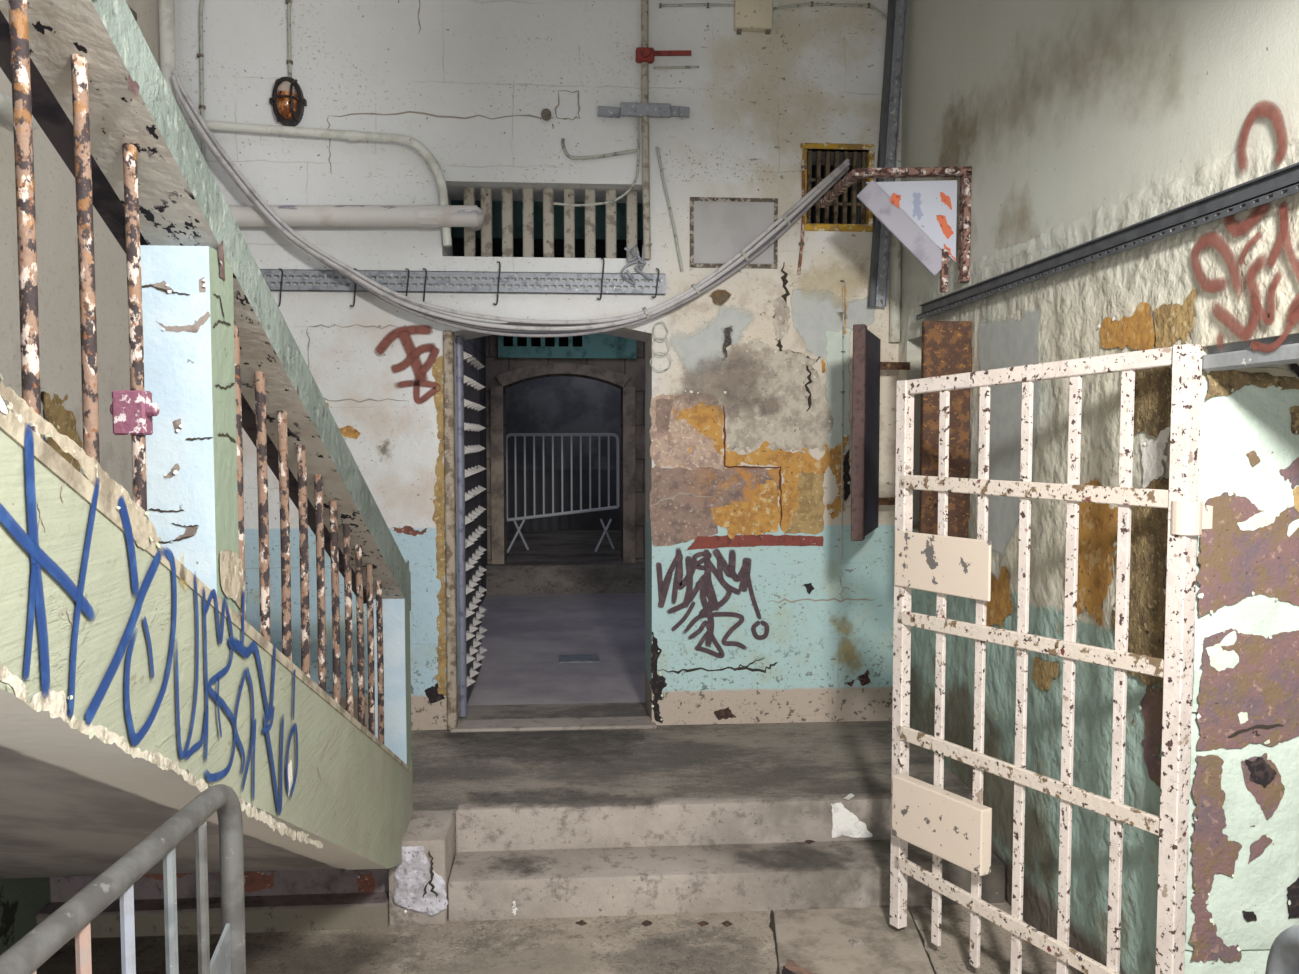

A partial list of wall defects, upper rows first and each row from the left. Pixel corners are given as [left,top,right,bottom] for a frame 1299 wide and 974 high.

spalling [0,375,199,550]
flaking render [649,297,851,546]
crack [773,262,821,411]
flaking render [1077,502,1168,659]
peeling [1098,288,1196,350]
flaking render [1132,366,1172,490]
peeling [1196,457,1299,617]
spalling [1206,370,1299,435]
crack [658,658,778,674]
peeling [1127,671,1163,788]
peeling [1190,628,1299,963]
spalling [392,846,448,916]